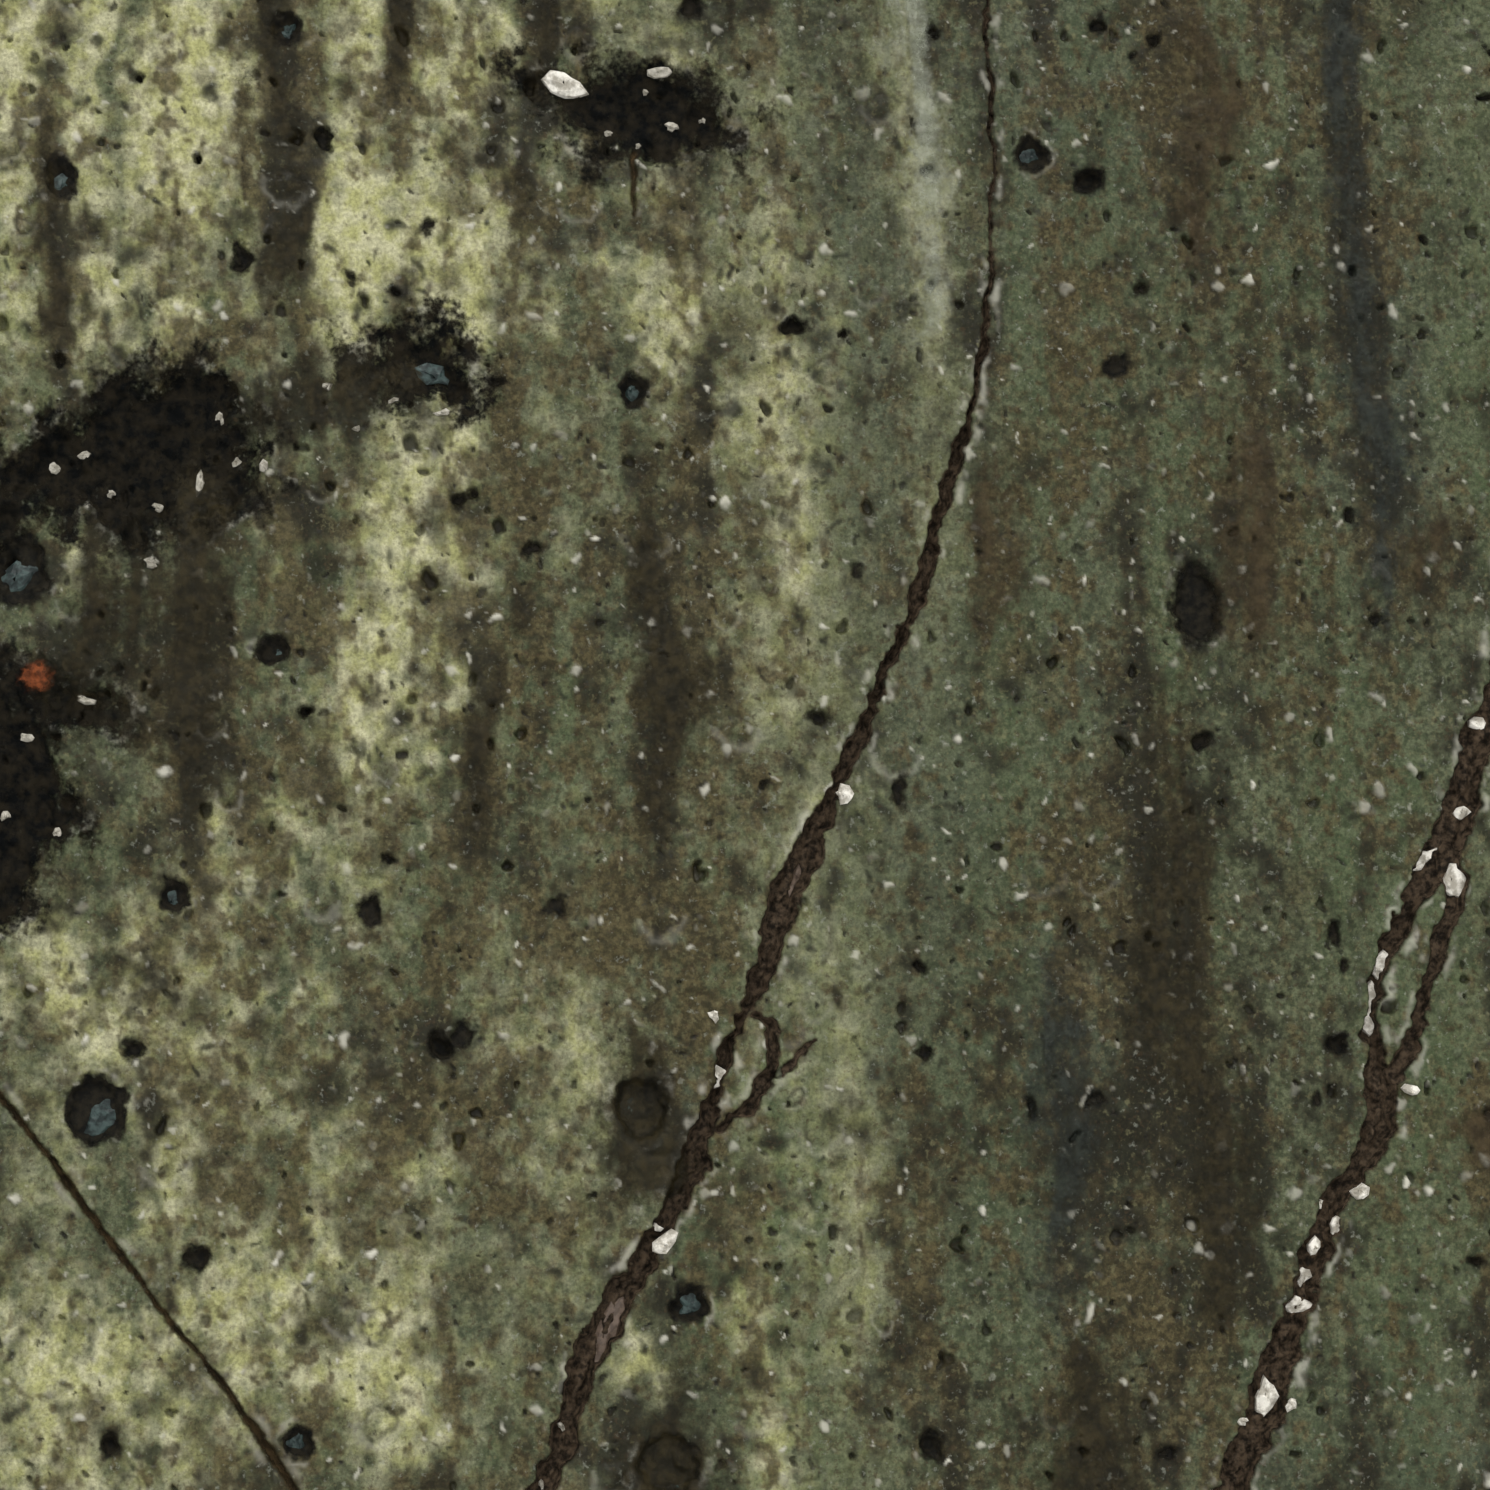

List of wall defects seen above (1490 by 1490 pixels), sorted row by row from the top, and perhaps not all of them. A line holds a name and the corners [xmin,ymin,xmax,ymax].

damp [45,458,237,823]
crack [0,1091,299,1490]
crack [526,0,997,1490]
crack [1213,662,1490,1490]